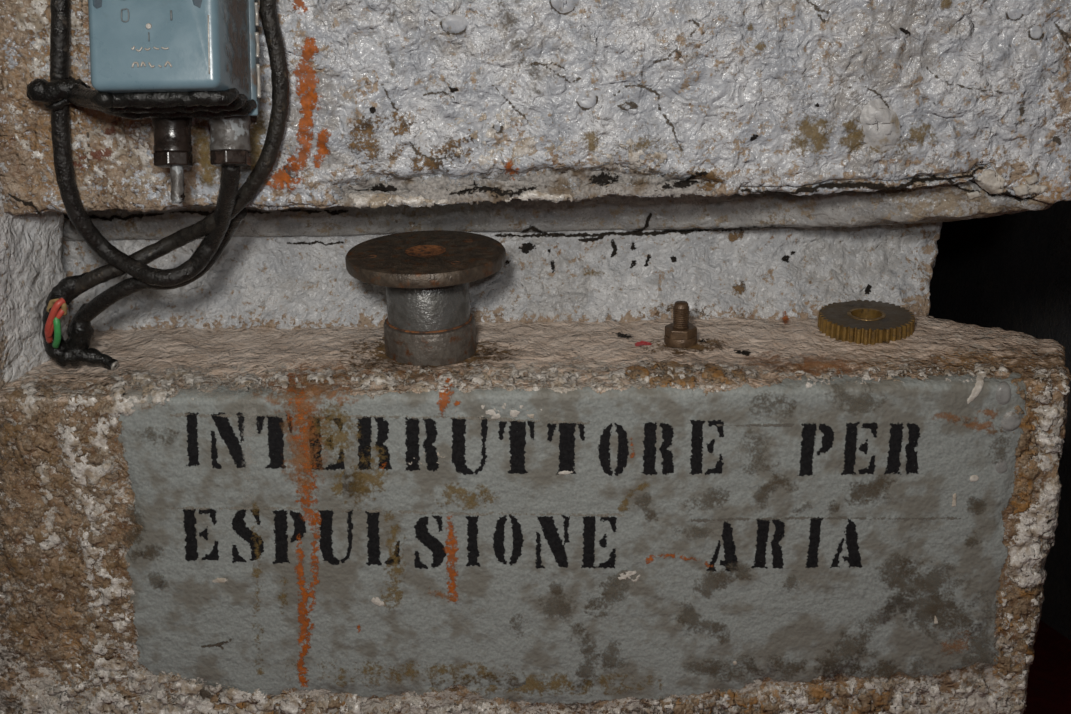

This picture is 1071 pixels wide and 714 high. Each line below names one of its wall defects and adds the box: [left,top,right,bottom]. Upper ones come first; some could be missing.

corrosion [266,37,331,190]
crack [741,165,1039,202]
crack [8,193,215,221]
crack [247,208,348,216]
crack [287,239,344,247]
crack [494,213,784,242]
leakage [313,405,388,503]
corrosion [255,313,519,687]
leakage [850,477,891,503]
corrosion [646,553,713,567]
leakage [771,553,992,682]
leakage [336,586,661,694]